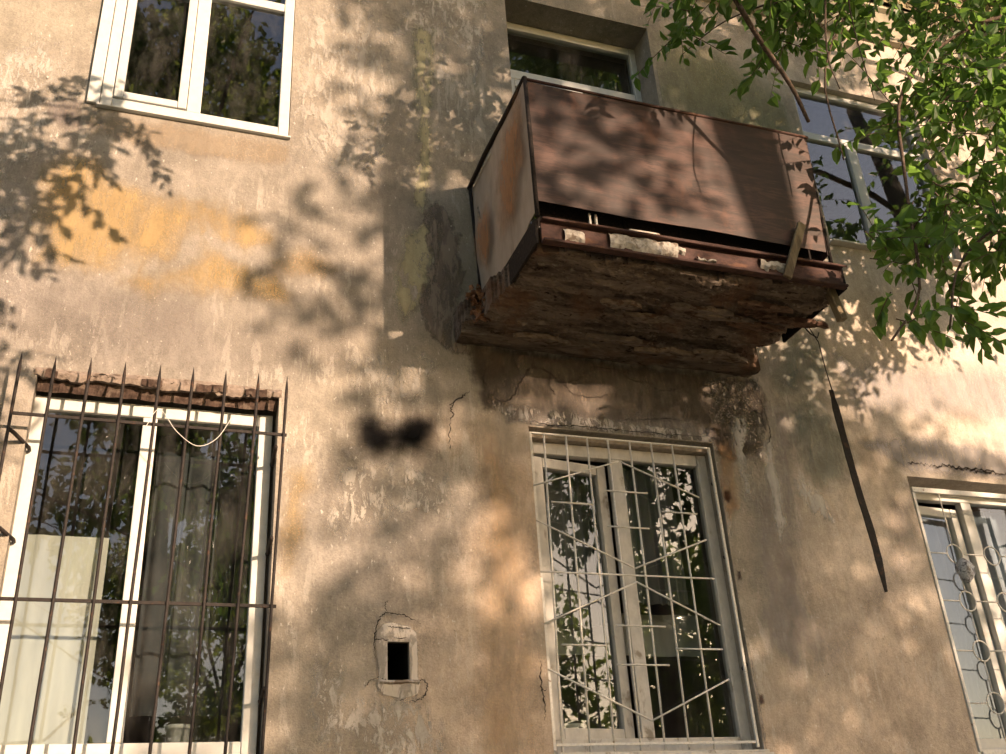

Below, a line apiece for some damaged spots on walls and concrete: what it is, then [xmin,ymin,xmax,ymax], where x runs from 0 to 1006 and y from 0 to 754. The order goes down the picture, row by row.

water stain [52,162,183,262]
spalling [585,333,748,363]
spalling [600,298,829,333]
crack [448,358,703,448]
peeling [493,401,718,450]
water stain [469,345,784,532]
flaking render [704,376,766,460]
crack [907,461,1006,475]
crack [365,600,421,688]